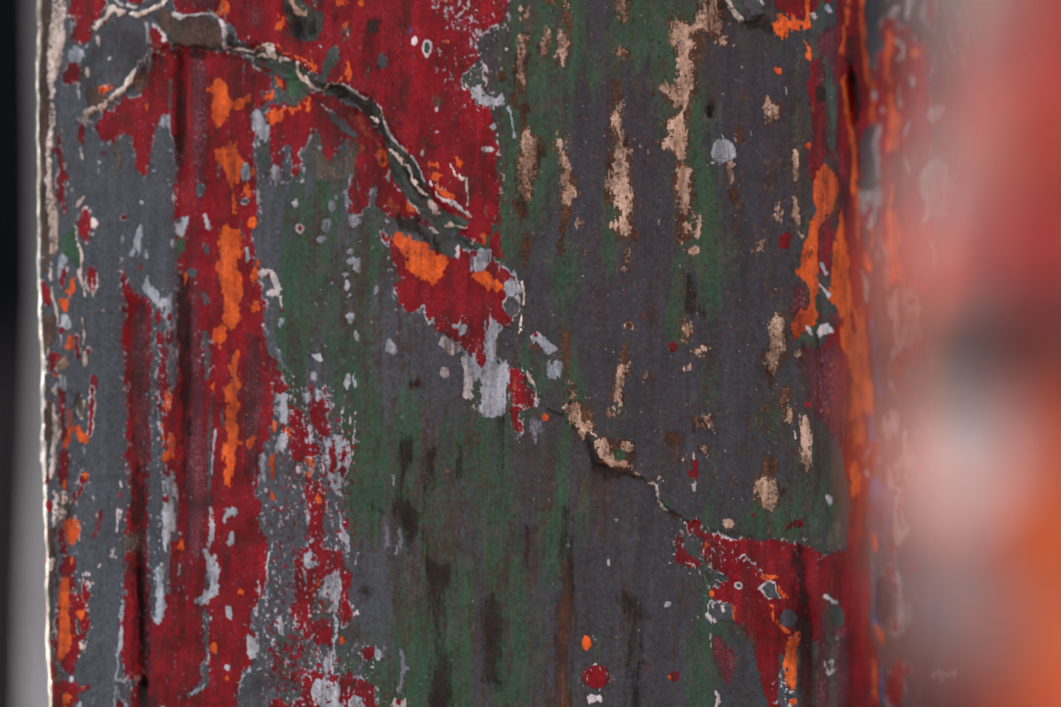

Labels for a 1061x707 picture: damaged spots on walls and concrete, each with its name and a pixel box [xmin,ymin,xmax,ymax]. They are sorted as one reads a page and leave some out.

peeling [36,0,563,707]
crack [232,43,472,259]
spalling [562,399,672,511]
peeling [669,0,1061,707]